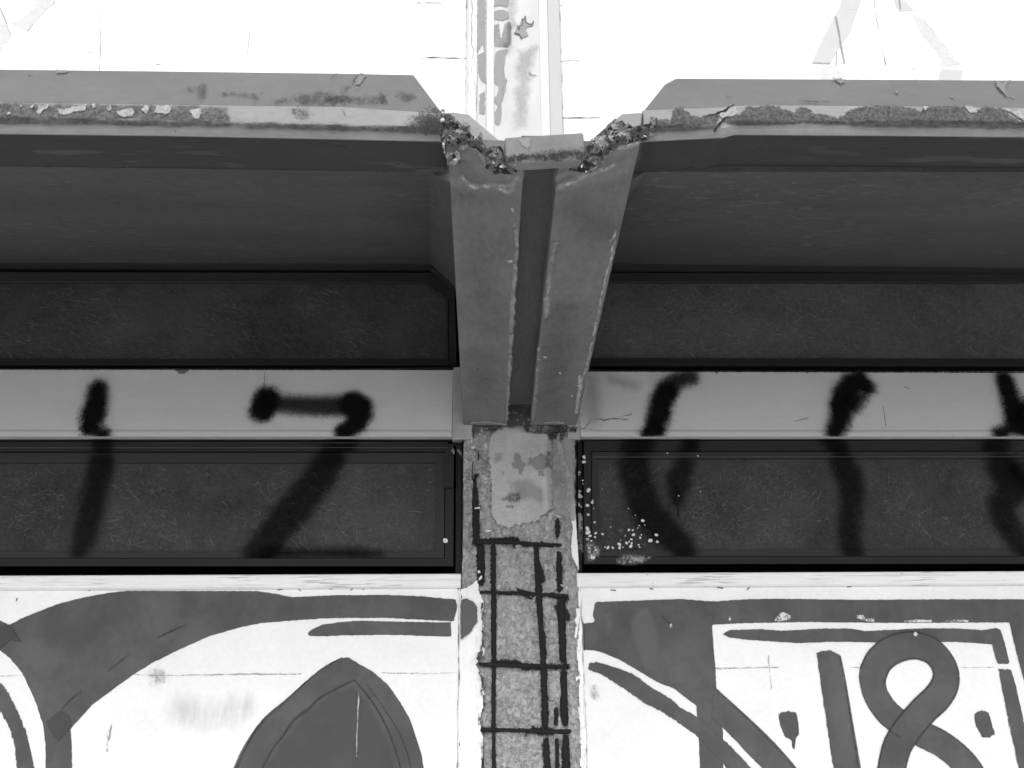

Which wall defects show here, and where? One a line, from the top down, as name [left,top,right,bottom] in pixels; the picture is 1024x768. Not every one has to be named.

peeling [5,103,172,117]
spalling [439,114,519,175]
spalling [569,117,658,173]
crack [707,104,738,132]
water stain [513,425,578,476]
spalling [451,229,585,768]